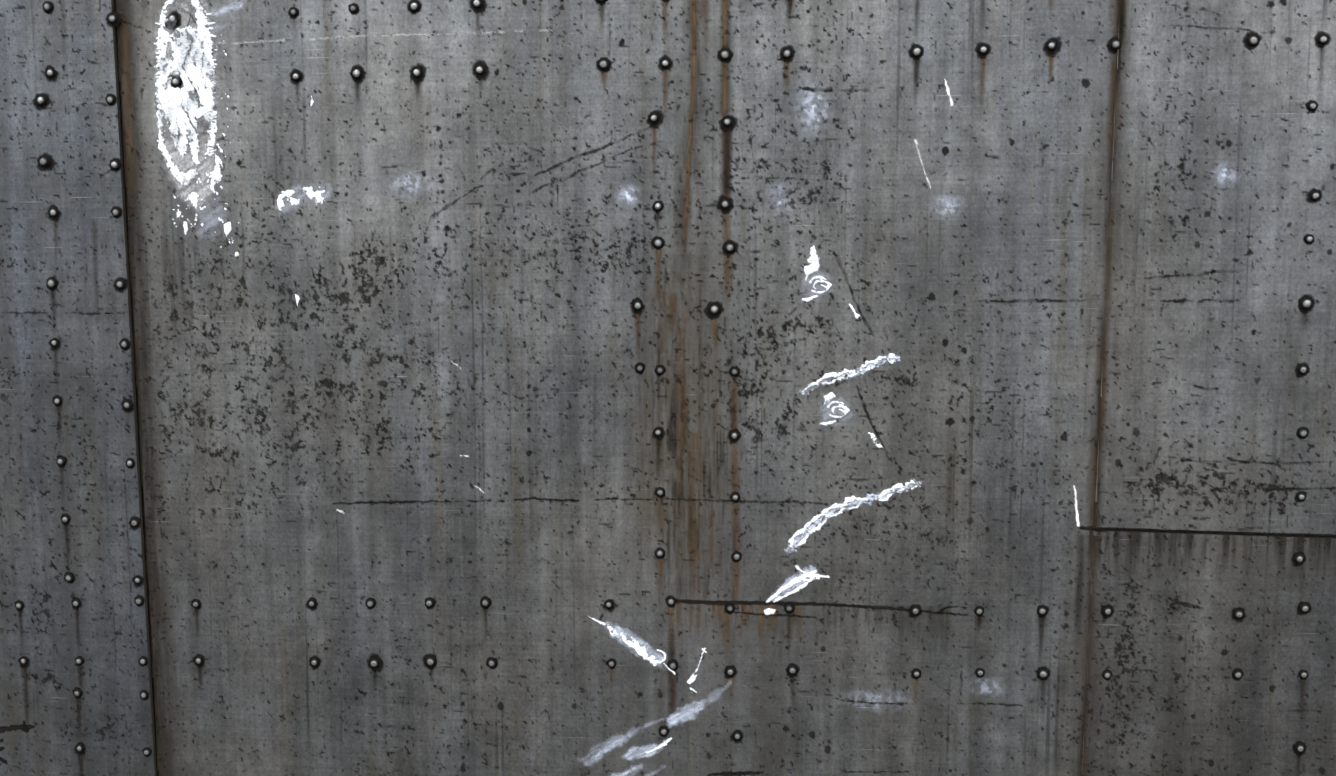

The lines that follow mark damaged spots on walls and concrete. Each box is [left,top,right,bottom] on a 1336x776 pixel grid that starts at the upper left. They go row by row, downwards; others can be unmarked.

rust [682,0,699,234]
rust [723,130,731,287]
water stain [1277,533,1332,552]